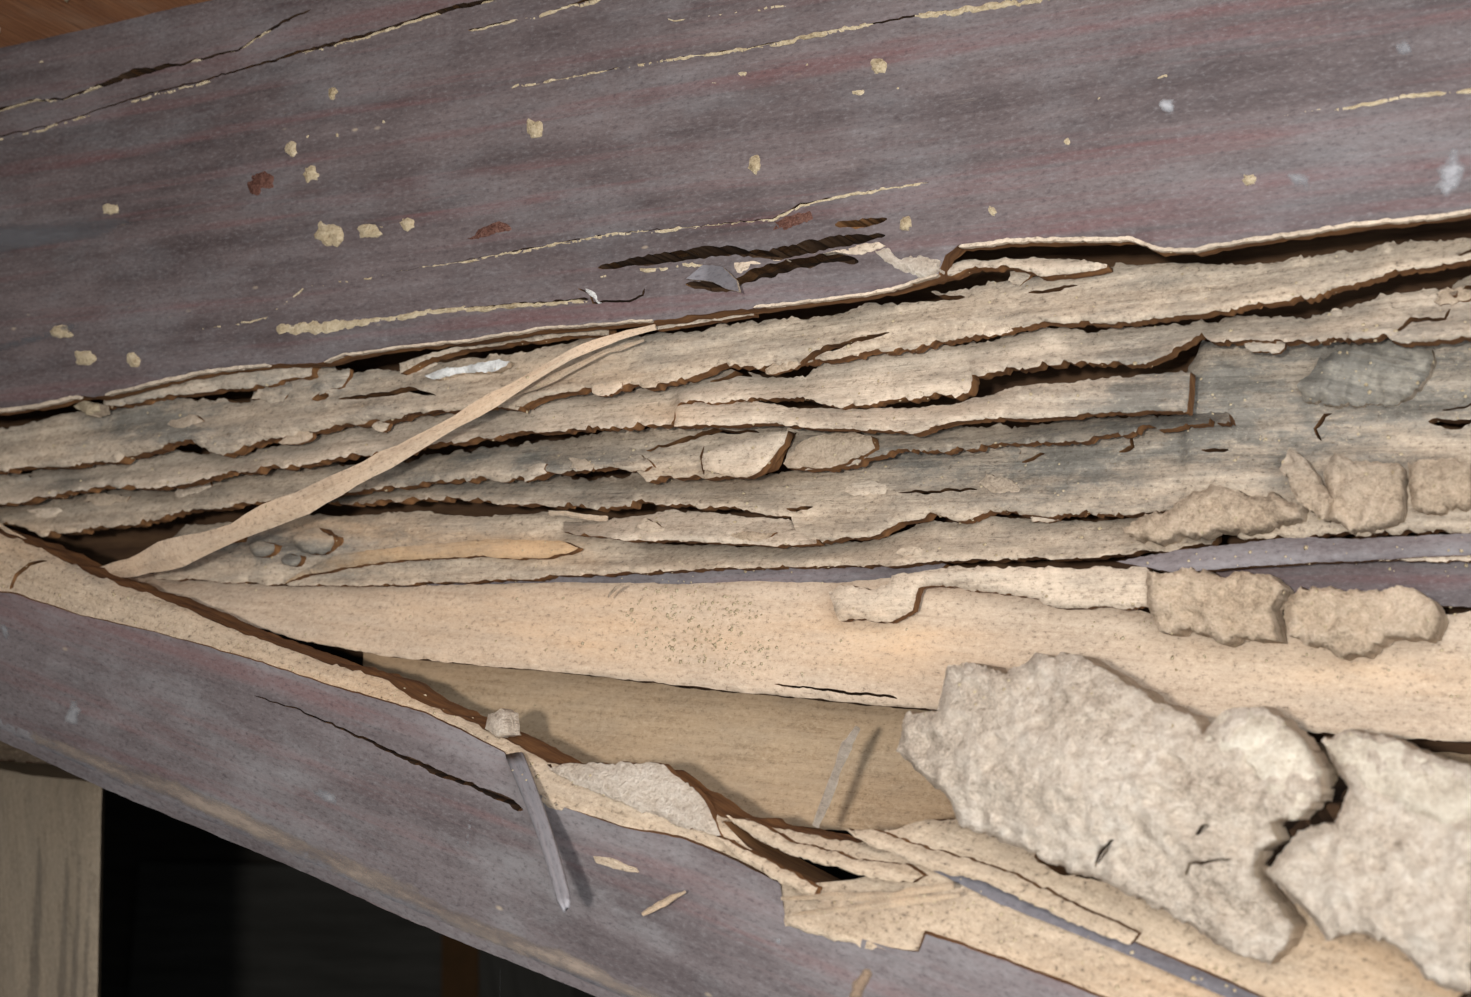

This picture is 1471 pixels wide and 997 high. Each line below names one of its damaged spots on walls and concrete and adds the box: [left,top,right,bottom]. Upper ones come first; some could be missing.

crack [0,0,600,140]
crack [512,0,1042,88]
crack [1284,88,1471,116]
crack [203,182,945,335]
peeling [486,463,550,483]
peeling [569,458,595,472]
peeling [613,454,656,473]
peeling [702,431,887,496]
peeling [284,539,583,584]
peeling [829,546,1153,623]
crack [256,696,522,811]
peeling [505,752,724,913]